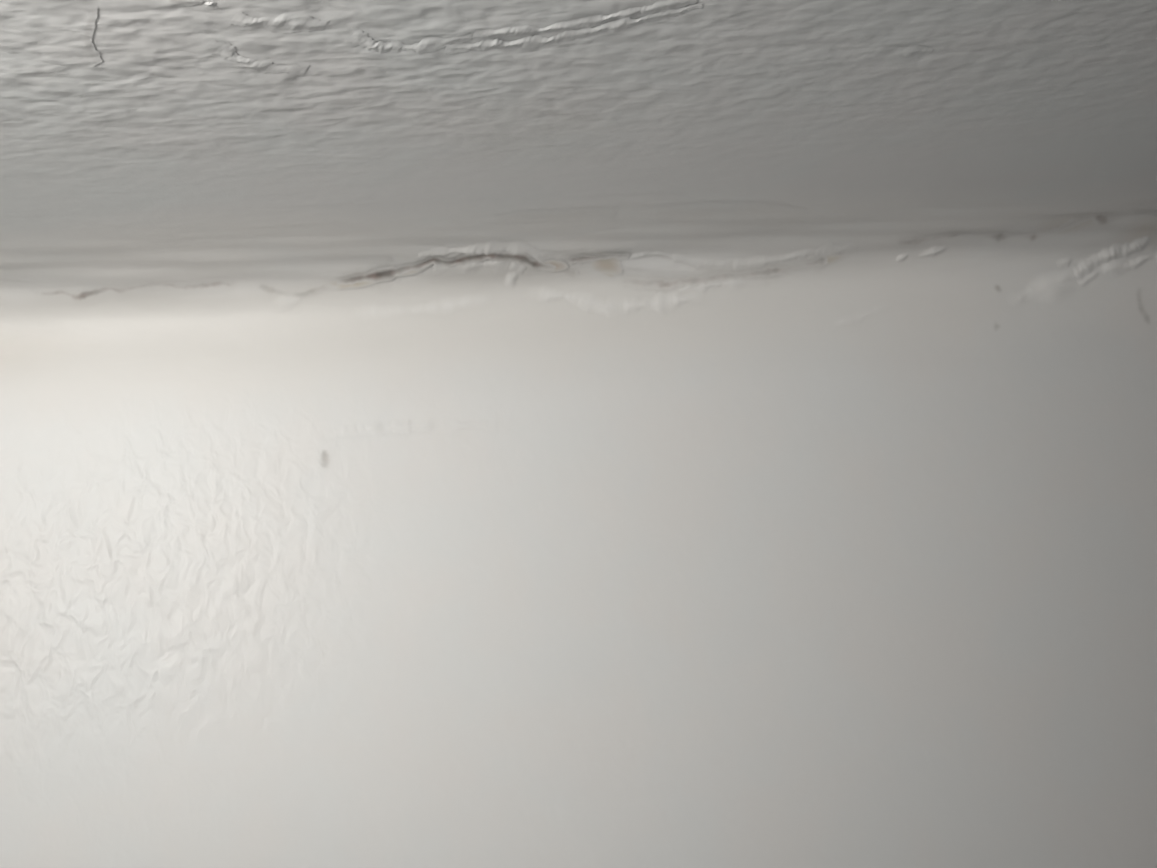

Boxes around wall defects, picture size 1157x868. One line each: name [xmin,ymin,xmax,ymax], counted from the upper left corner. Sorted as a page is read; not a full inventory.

crack [0,238,845,307]